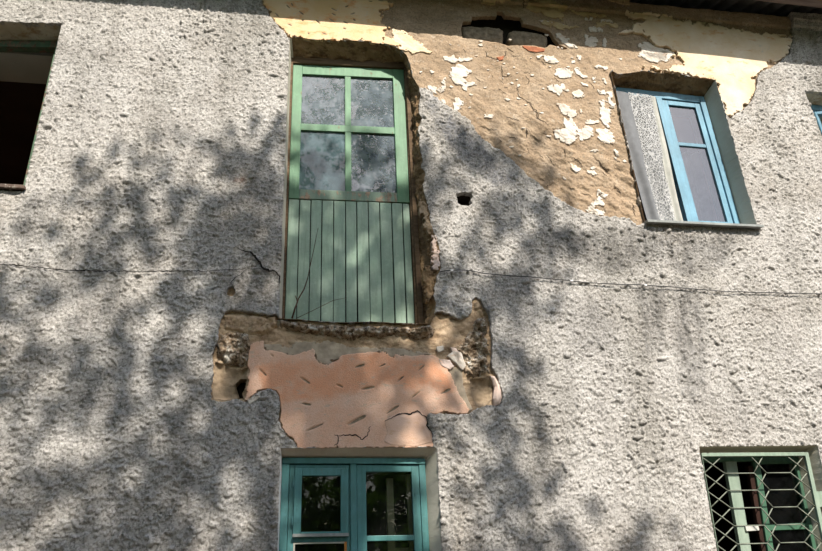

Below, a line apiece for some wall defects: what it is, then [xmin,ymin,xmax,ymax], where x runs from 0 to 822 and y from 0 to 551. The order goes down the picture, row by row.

flaking render [262,0,793,225]
crack [0,248,280,282]
flaking render [211,298,502,449]